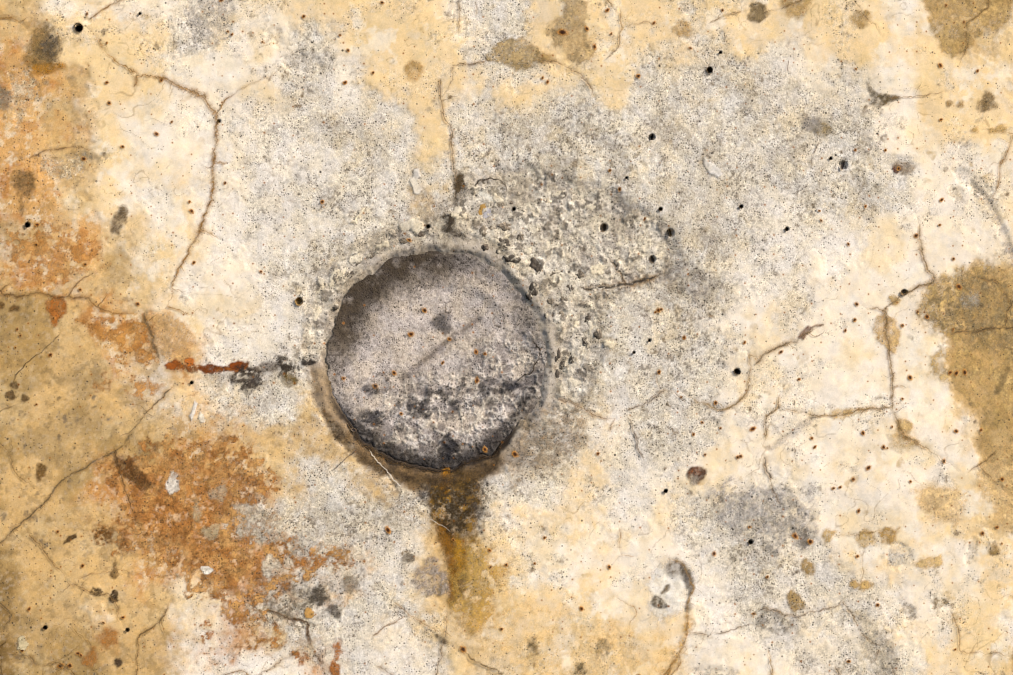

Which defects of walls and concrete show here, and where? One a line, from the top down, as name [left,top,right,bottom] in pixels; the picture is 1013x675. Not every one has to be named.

damp [926,0,1013,57]
rust [6,220,101,284]
rust [46,296,67,326]
crack [0,44,229,358]
rust [131,381,158,398]
rust [75,312,249,374]
spalling [303,163,672,414]
crack [764,225,948,503]
damp [918,263,1013,527]
rust [92,434,354,664]
rust [428,468,510,634]
crack [664,560,895,675]